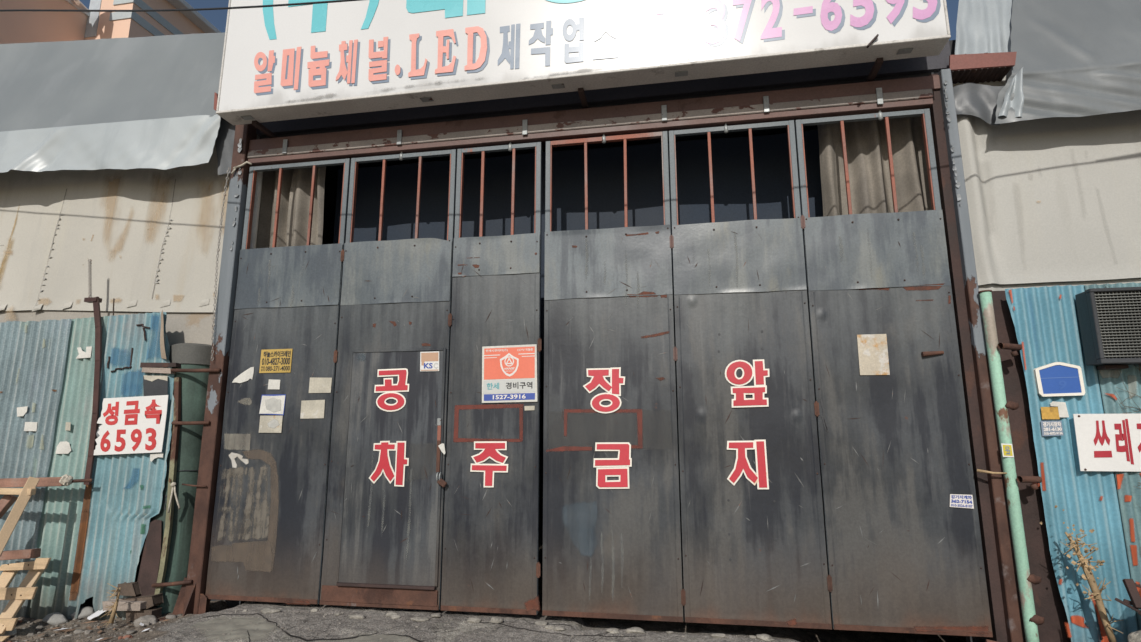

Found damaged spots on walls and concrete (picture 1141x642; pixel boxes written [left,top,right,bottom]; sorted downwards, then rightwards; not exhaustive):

peeling [1117,474,1132,502]
peeling [1129,518,1138,566]
rust [1027,574,1042,585]
rust [1029,615,1045,625]
peeling [1066,595,1109,642]